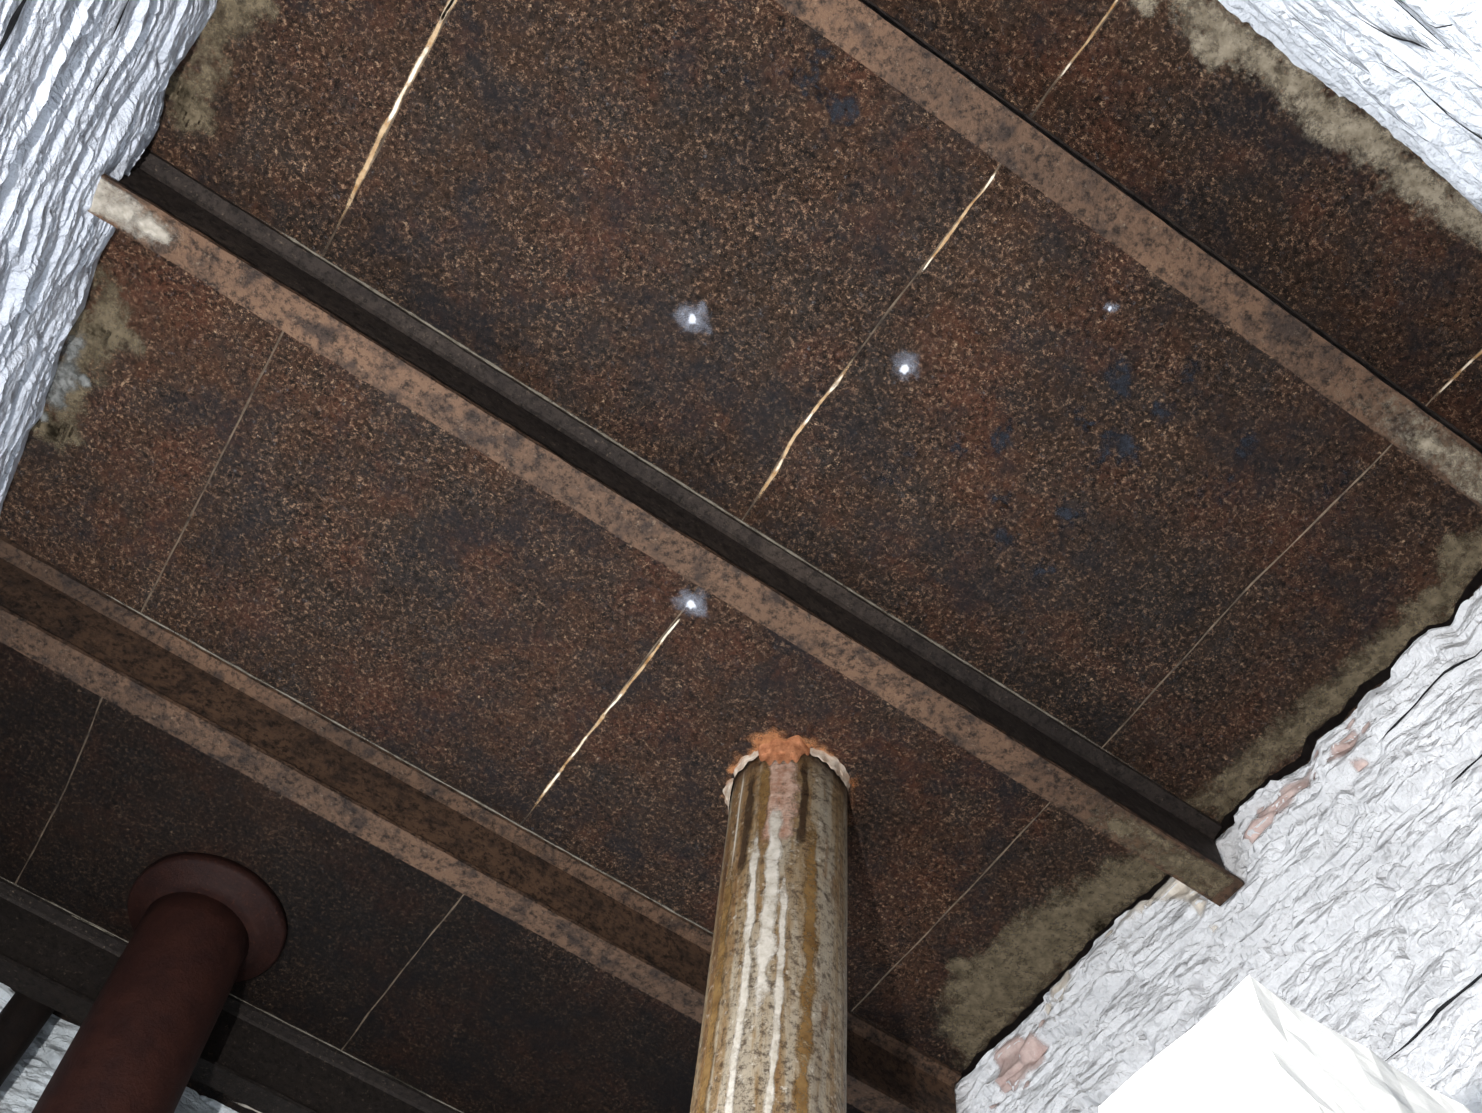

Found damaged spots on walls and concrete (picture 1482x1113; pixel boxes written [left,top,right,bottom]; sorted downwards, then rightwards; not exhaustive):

rust [1061,0,1118,76]
rust [344,0,457,214]
water stain [1133,0,1482,248]
rust [924,173,996,269]
rust [759,367,849,495]
water stain [1396,418,1482,503]
rust [1439,350,1482,393]
rust [537,620,679,804]
rust [723,729,855,816]
water stain [1185,528,1482,821]
water stain [939,814,1233,1067]